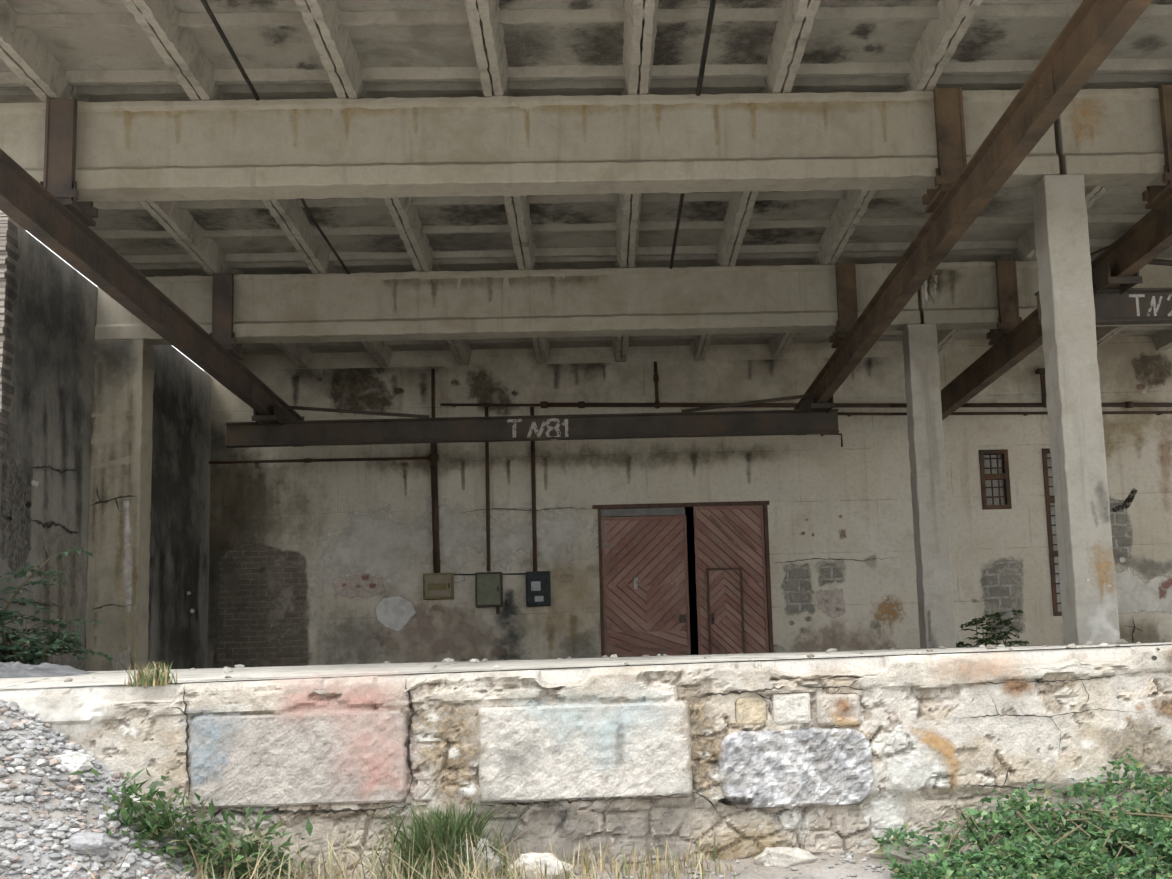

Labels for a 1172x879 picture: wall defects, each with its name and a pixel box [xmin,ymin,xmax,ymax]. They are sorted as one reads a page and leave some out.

water stain [574,27,624,66]
water stain [653,23,688,66]
water stain [802,46,846,64]
spalling [1132,354,1171,394]
crack [29,456,137,510]
crack [26,514,79,534]
water stain [121,500,132,613]
spalling [1109,488,1168,575]
spalling [215,505,597,668]
spalling [782,562,892,652]
crack [962,672,1148,748]
rust [917,733,957,785]